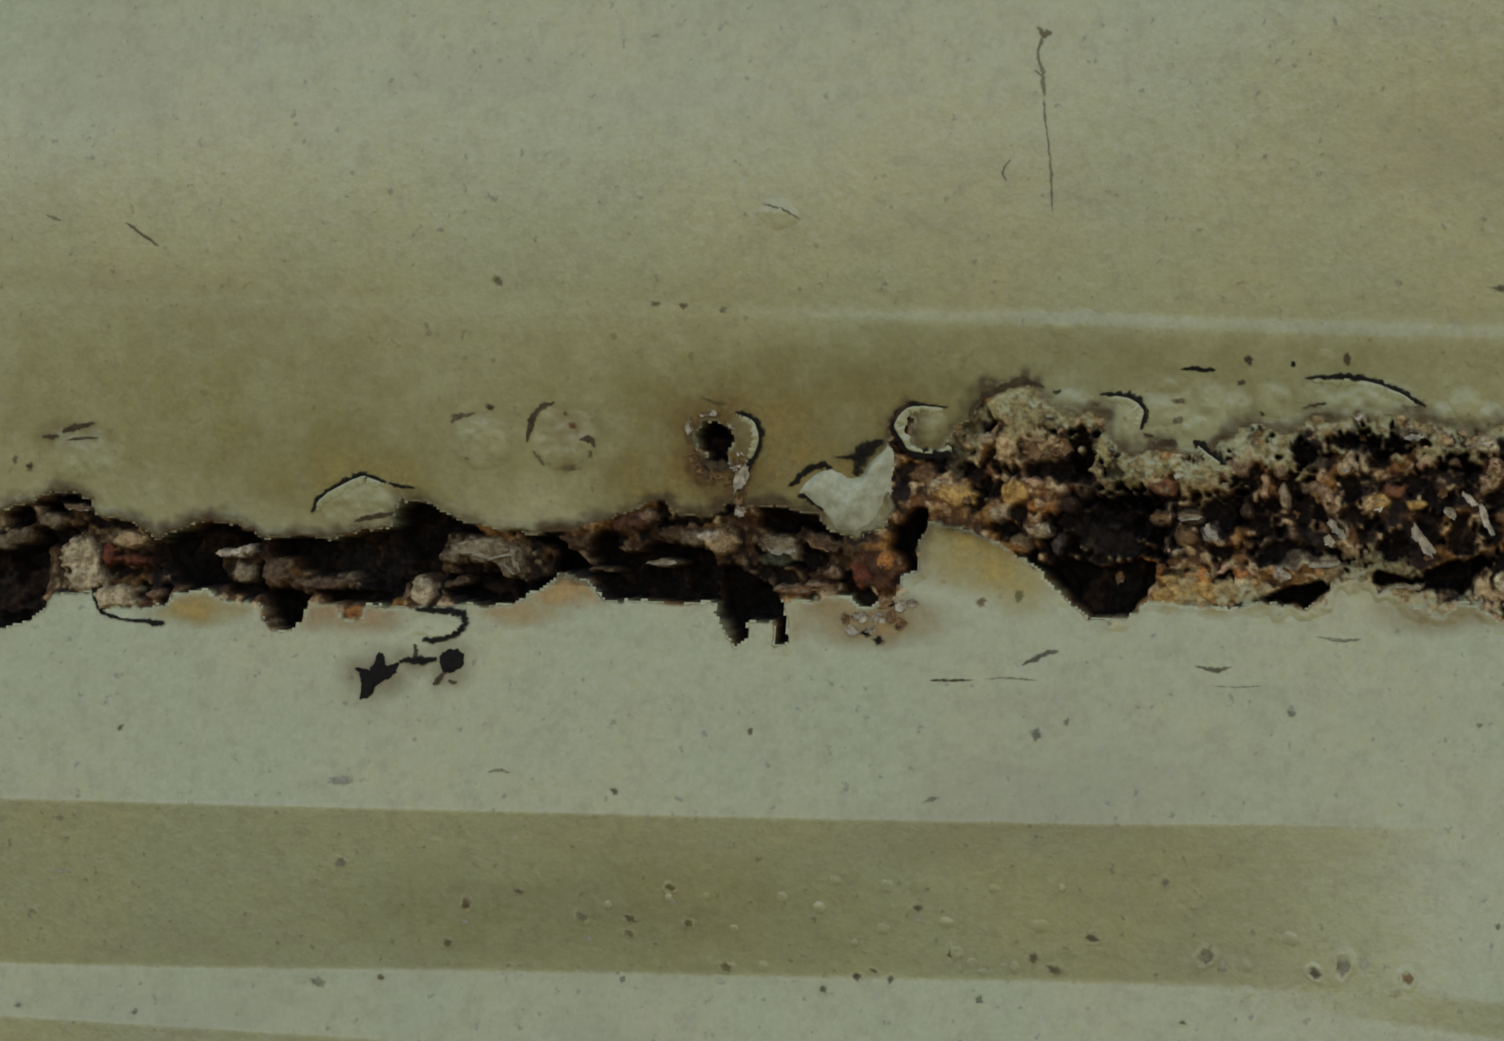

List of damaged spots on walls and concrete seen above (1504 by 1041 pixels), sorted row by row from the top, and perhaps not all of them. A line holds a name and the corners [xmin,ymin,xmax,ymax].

spalling [0,502,70,628]
peeling [85,587,165,626]
spalling [167,501,837,644]
corrosion [125,371,1504,657]